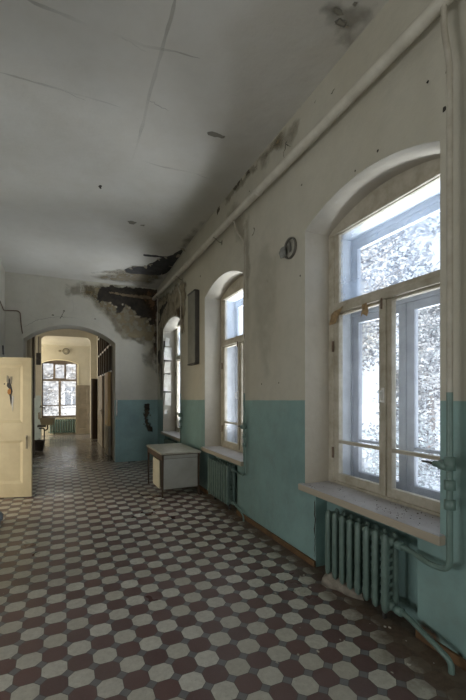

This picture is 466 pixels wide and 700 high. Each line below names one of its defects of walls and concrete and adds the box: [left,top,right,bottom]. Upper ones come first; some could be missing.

peeling [125,248,185,275]
flaking render [97,282,186,414]